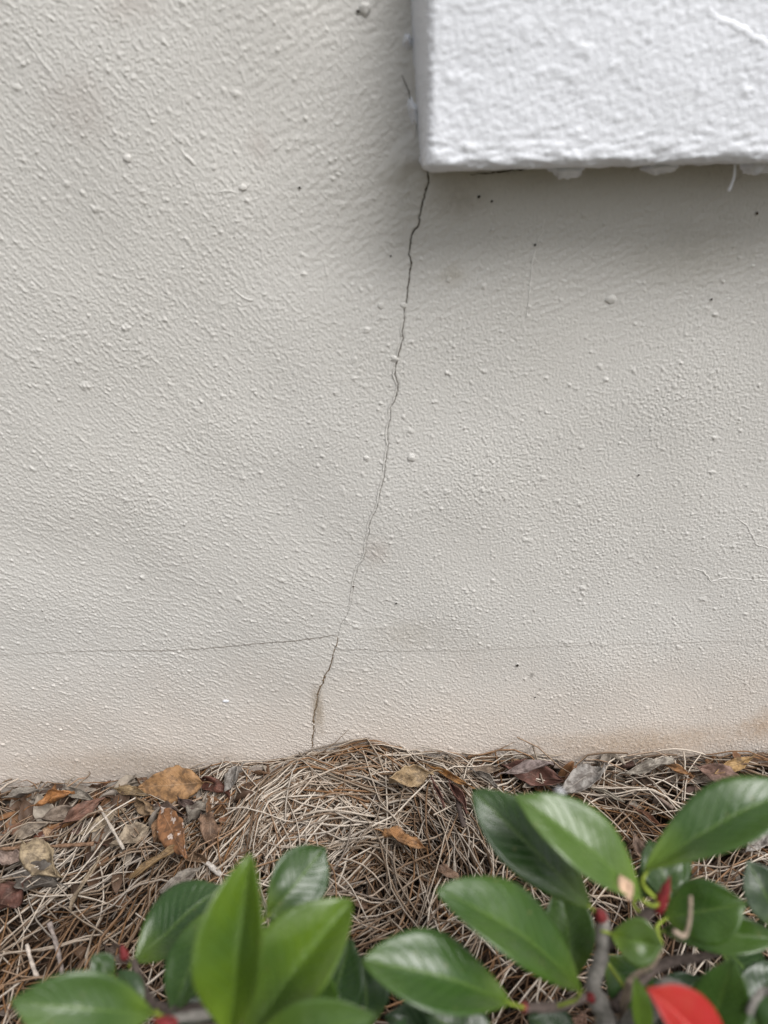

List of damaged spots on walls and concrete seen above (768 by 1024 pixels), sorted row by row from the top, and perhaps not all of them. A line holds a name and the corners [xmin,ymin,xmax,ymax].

crack [110,171,429,751]